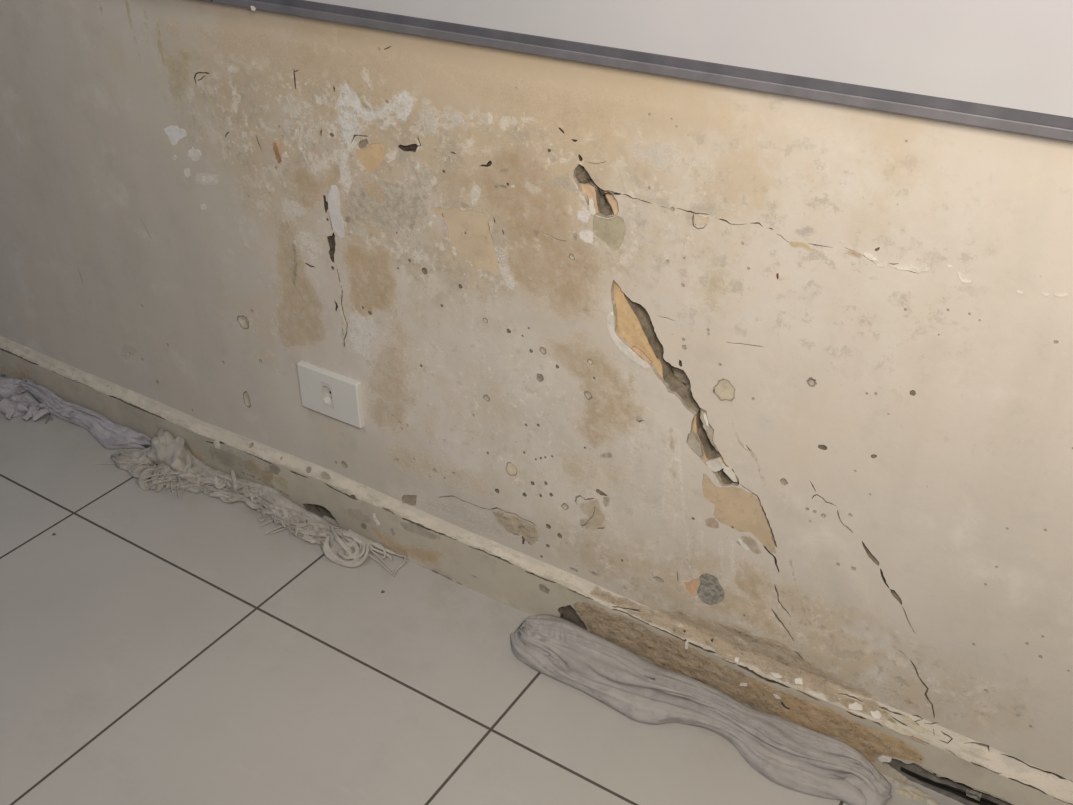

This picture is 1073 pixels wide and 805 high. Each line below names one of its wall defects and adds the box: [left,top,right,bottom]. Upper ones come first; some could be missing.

crack [323,195,348,348]
peeling [398,138,421,152]
leakage [259,36,619,346]
flaking render [558,127,626,251]
crack [622,194,971,283]
leakage [555,342,645,457]
spalling [558,605,587,630]
crack [382,508,819,701]
flaking render [677,573,725,606]
leakage [573,564,923,764]
crack [810,481,935,744]
spalling [878,756,1014,805]